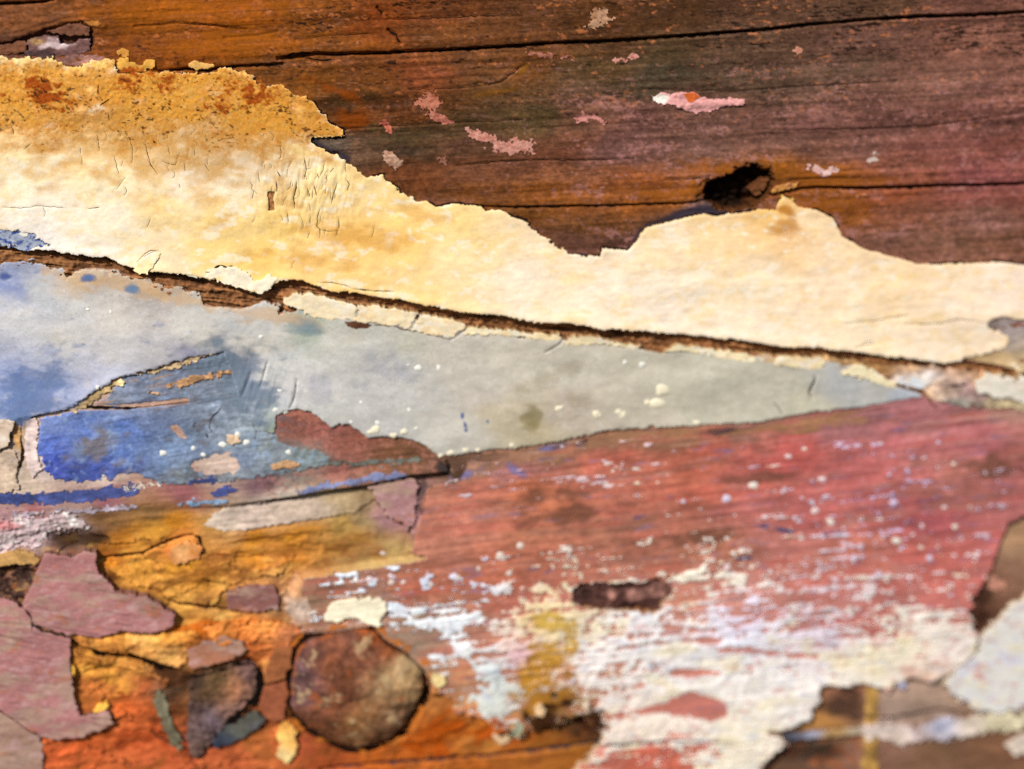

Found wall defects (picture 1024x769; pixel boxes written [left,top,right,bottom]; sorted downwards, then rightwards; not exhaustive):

crack [119,8,1024,90]
peeling [0,48,1024,403]
crack [456,158,630,166]
crack [484,177,707,209]
crack [770,177,1024,195]
peeling [0,258,1024,769]